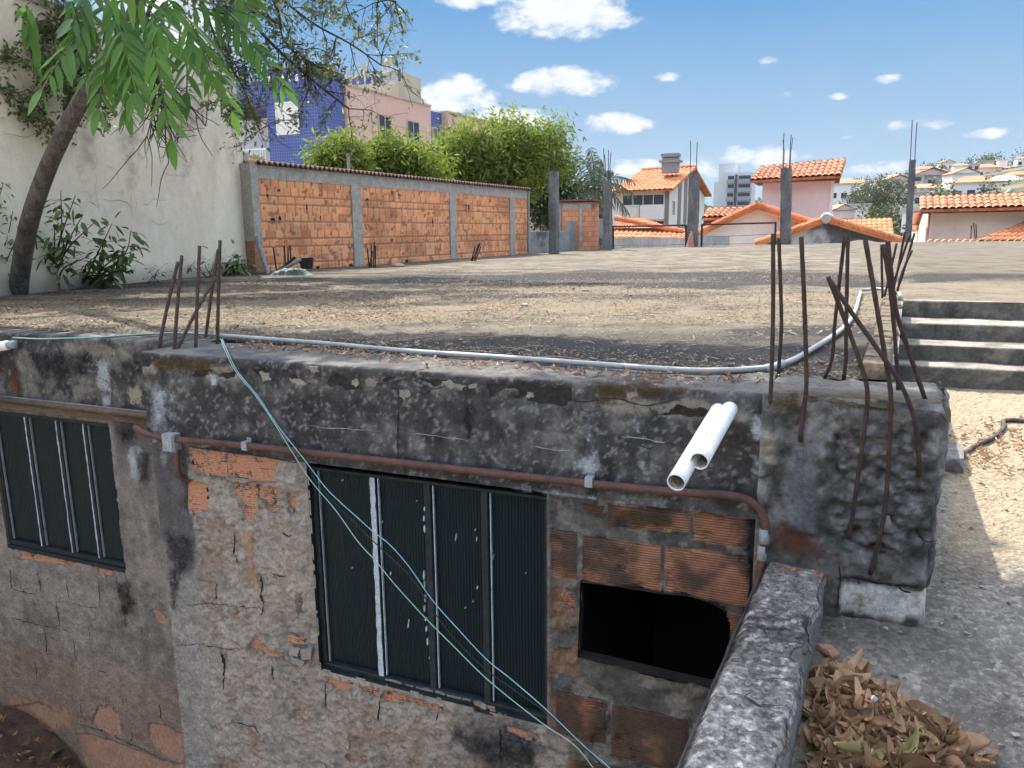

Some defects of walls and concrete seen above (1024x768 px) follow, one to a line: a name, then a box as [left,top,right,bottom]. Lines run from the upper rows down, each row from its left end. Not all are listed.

efflorescence [97,360,111,407]
peeling [351,378,378,387]
peeling [442,380,477,391]
crack [570,396,688,415]
spalling [188,448,296,524]
damp [118,582,134,624]
damp [167,536,192,604]
crack [183,572,286,615]
crack [185,643,242,690]
spalling [77,705,185,768]